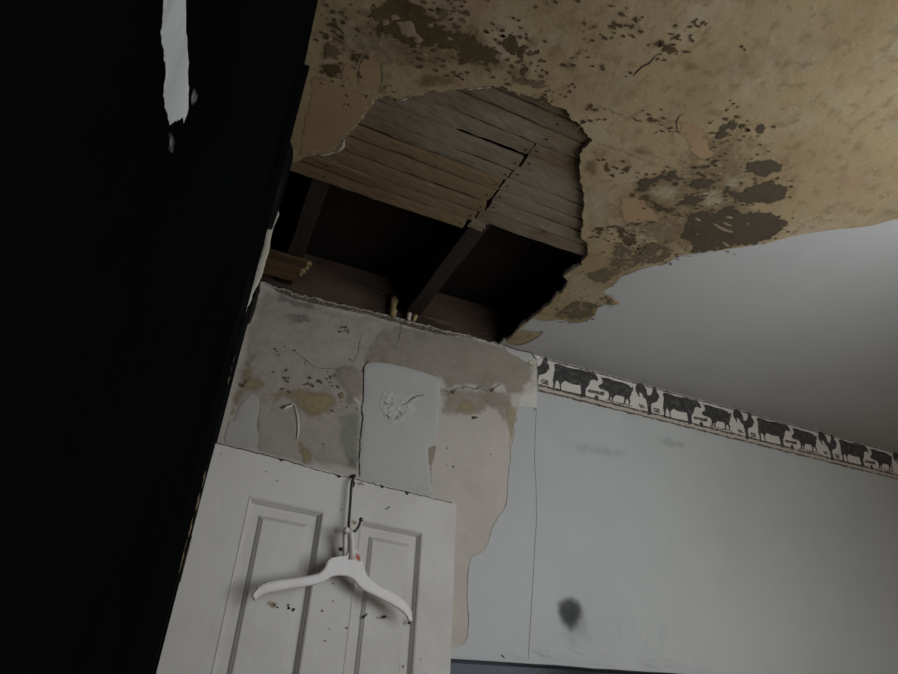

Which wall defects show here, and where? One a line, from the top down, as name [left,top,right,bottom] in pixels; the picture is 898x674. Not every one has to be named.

peeling [217,0,898,647]